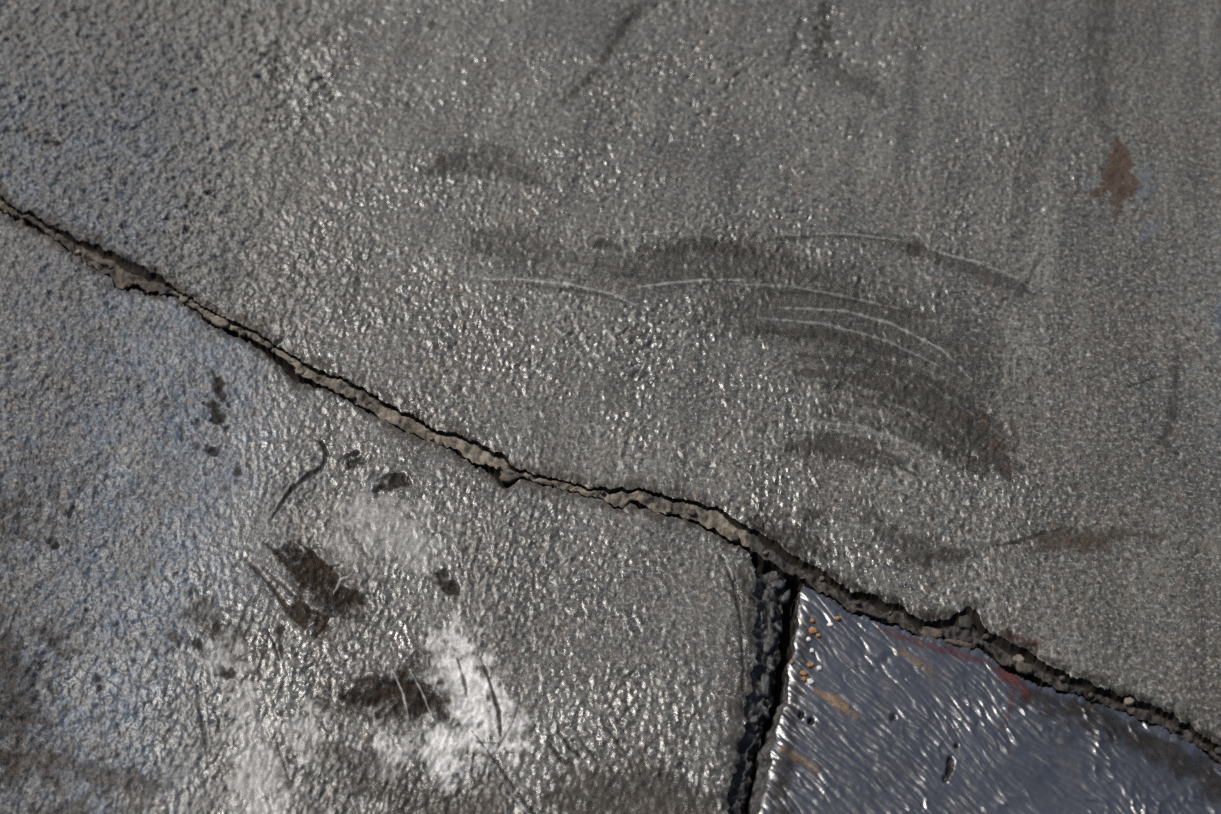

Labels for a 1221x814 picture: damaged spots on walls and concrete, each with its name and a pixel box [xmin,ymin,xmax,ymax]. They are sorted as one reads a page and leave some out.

corrosion [1091,138,1148,220]
crack [0,195,1221,814]